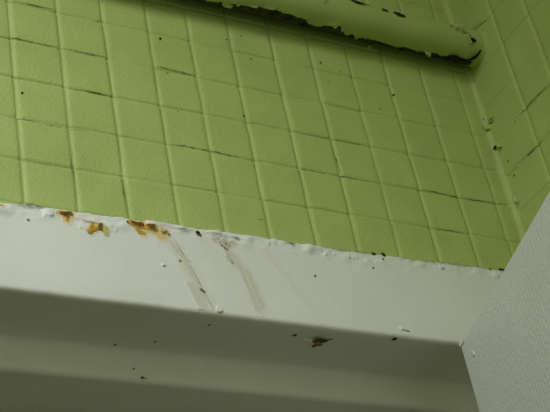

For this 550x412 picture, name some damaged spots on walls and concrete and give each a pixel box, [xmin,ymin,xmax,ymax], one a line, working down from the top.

peeling [416,49,481,69]
rust [55,209,77,227]
rust [83,221,111,237]
rust [125,218,171,243]